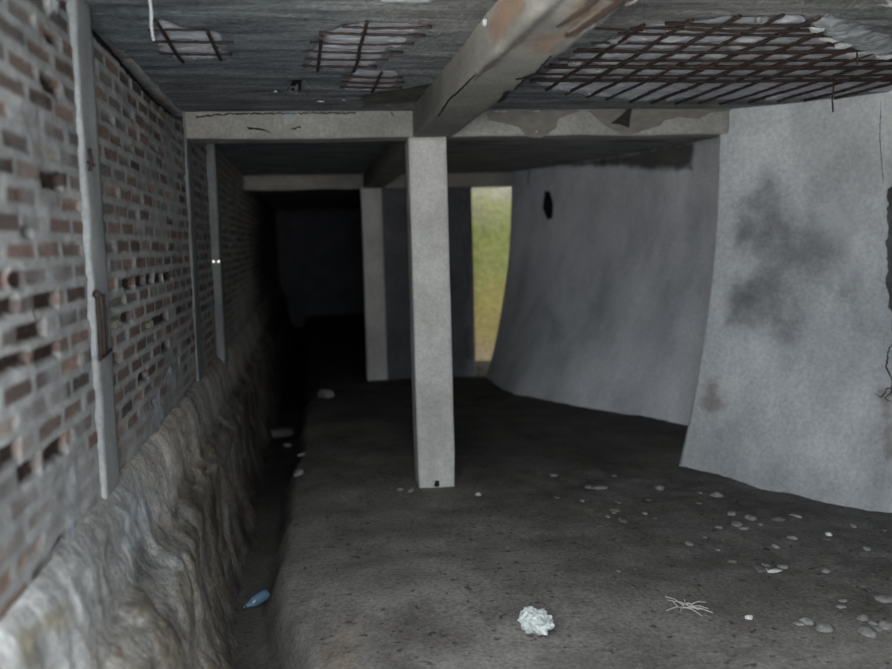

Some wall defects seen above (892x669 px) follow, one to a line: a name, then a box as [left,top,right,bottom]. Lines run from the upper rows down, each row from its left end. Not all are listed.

spalling [148,0,225,59]
spalling [309,21,429,107]
spalling [537,0,892,136]
flaking render [484,110,578,138]